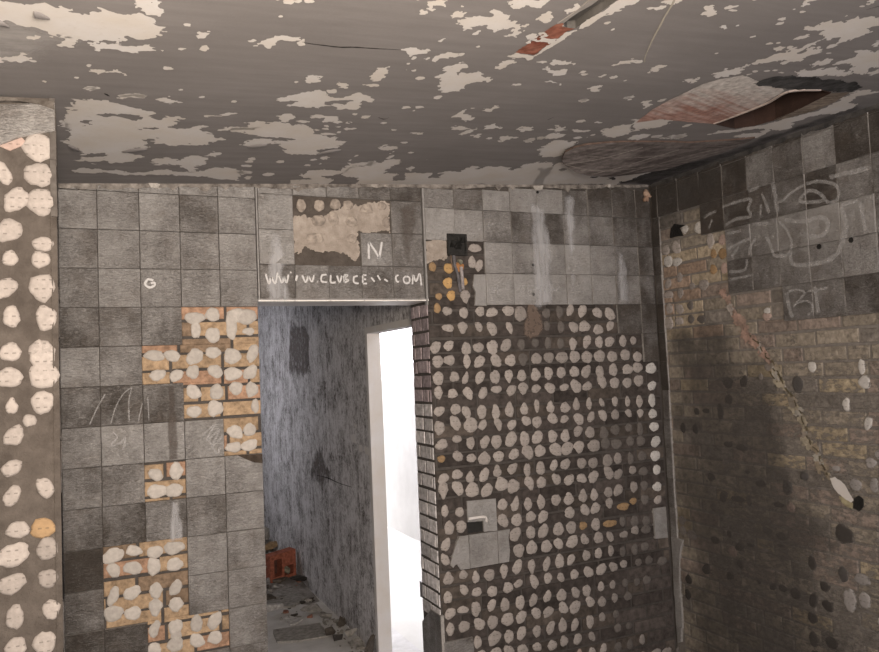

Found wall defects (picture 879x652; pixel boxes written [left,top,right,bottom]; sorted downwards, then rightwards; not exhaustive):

peeling [0,0,167,53]
peeling [248,35,305,49]
crack [304,42,399,50]
peeling [420,0,554,40]
peeling [713,0,879,78]
peeling [401,47,517,99]
peeling [57,66,693,185]
peeling [707,89,879,138]
peeling [292,196,391,266]
peeling [142,307,263,463]
peeling [144,461,186,502]
peeling [103,537,230,652]